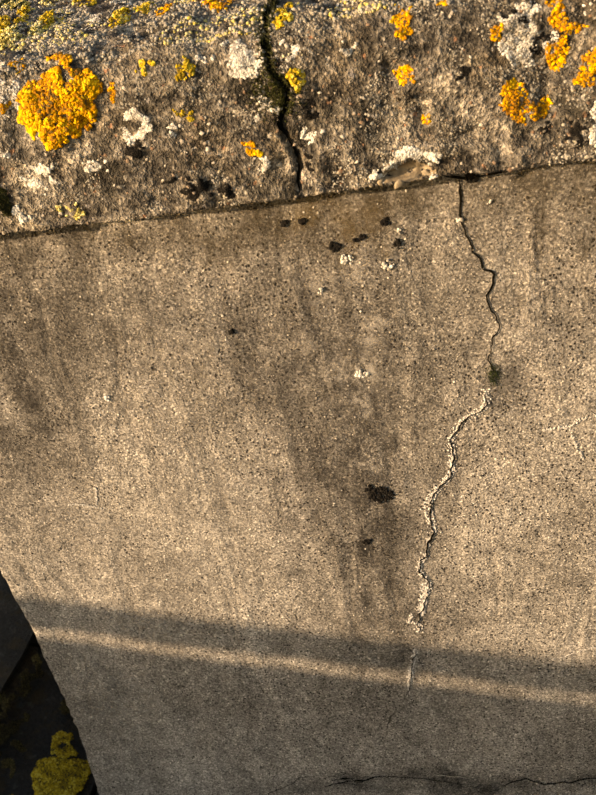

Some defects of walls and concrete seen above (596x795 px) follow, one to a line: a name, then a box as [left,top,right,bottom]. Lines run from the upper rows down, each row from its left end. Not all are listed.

crack [243,0,308,194]
crack [387,171,508,726]
crack [268,775,596,795]